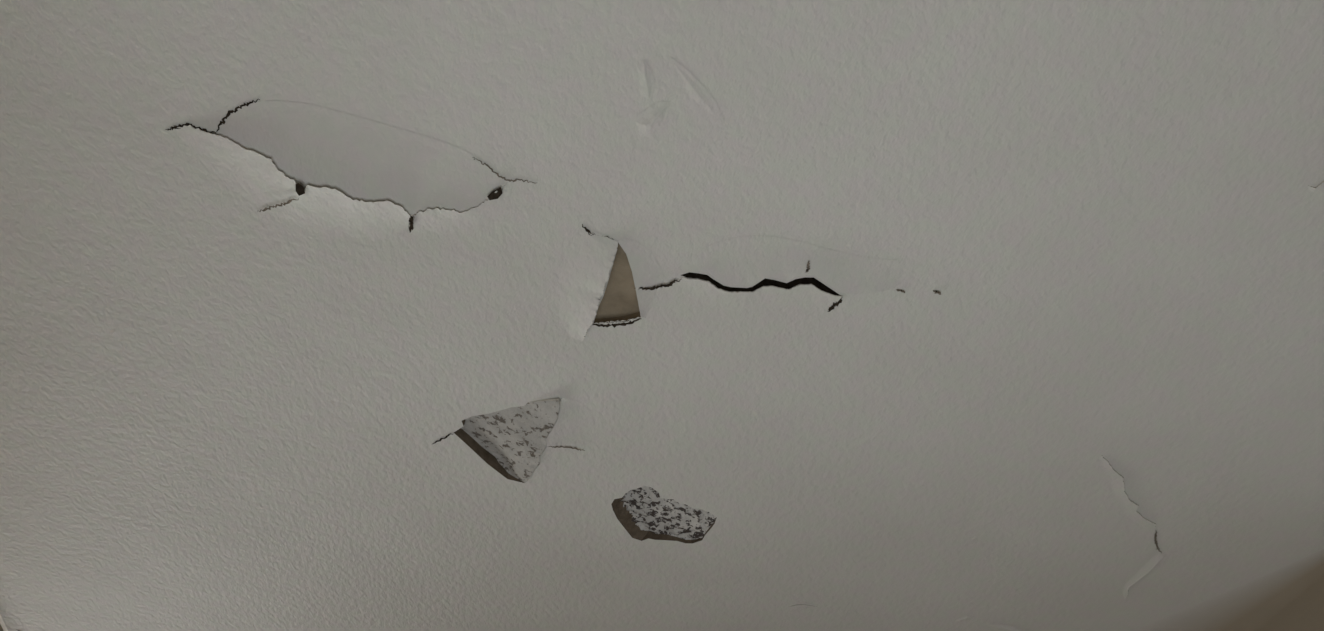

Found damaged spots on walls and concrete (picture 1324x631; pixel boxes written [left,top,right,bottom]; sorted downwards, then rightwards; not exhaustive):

peeling [165,99,534,247]
peeling [554,224,663,343]
crack [634,236,941,319]
spalling [433,398,595,487]
spalling [611,486,717,543]